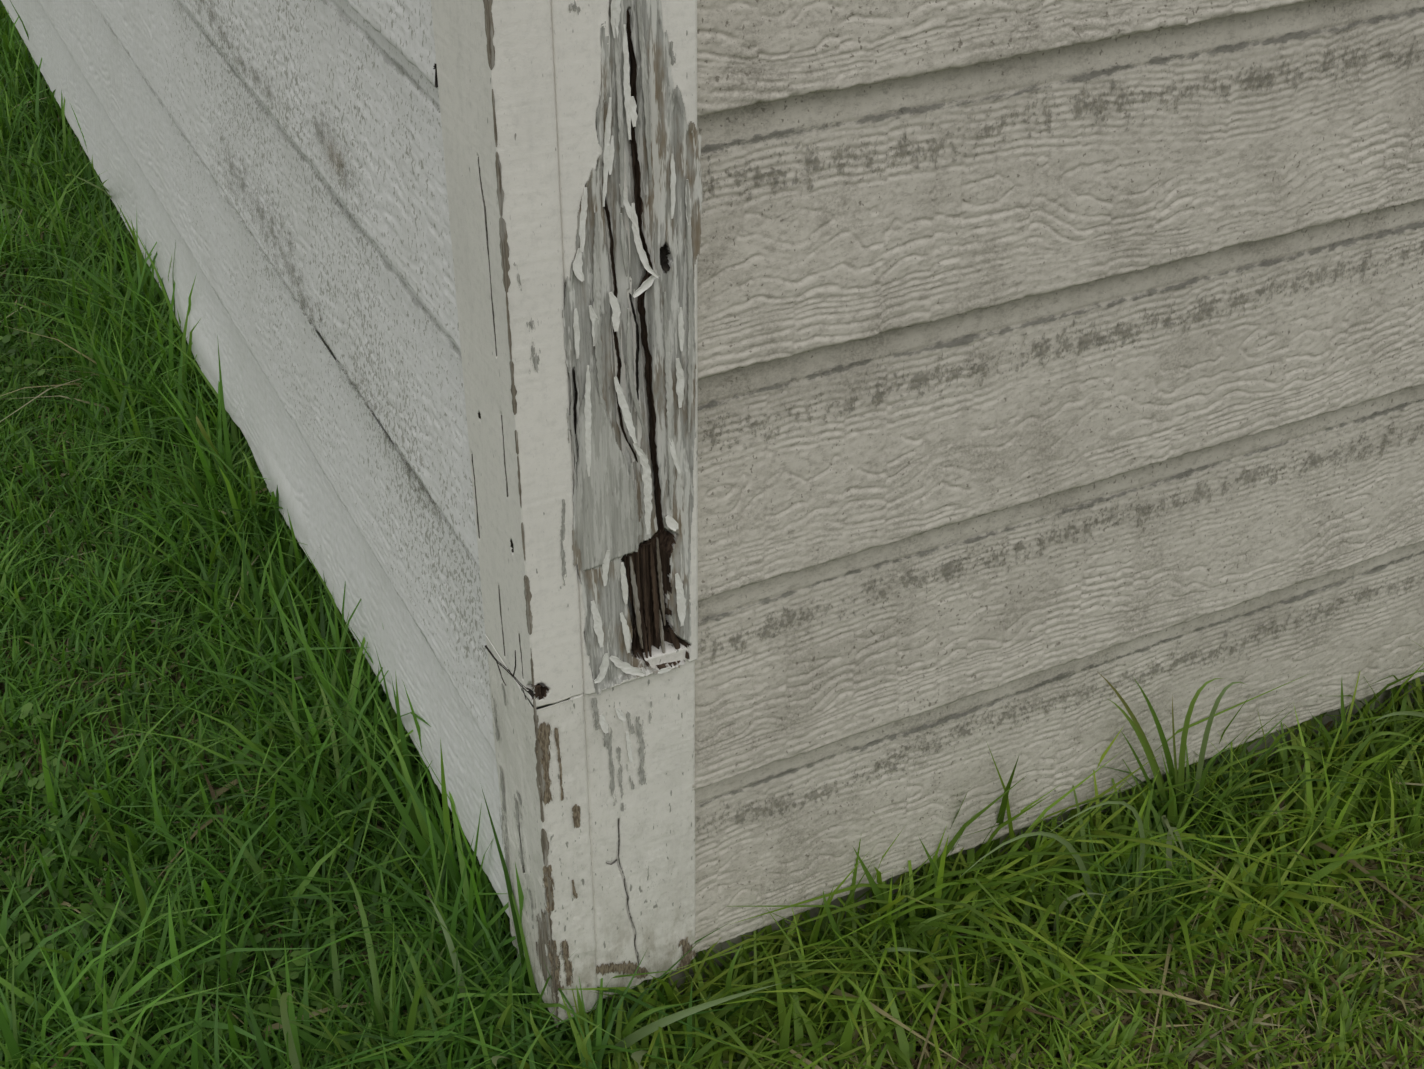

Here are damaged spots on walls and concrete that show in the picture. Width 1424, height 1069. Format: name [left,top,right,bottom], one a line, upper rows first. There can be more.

spalling [483,0,495,70]
spalling [492,89,539,635]
peeling [560,0,702,811]
peeling [499,653,581,1027]
crack [606,818,639,965]